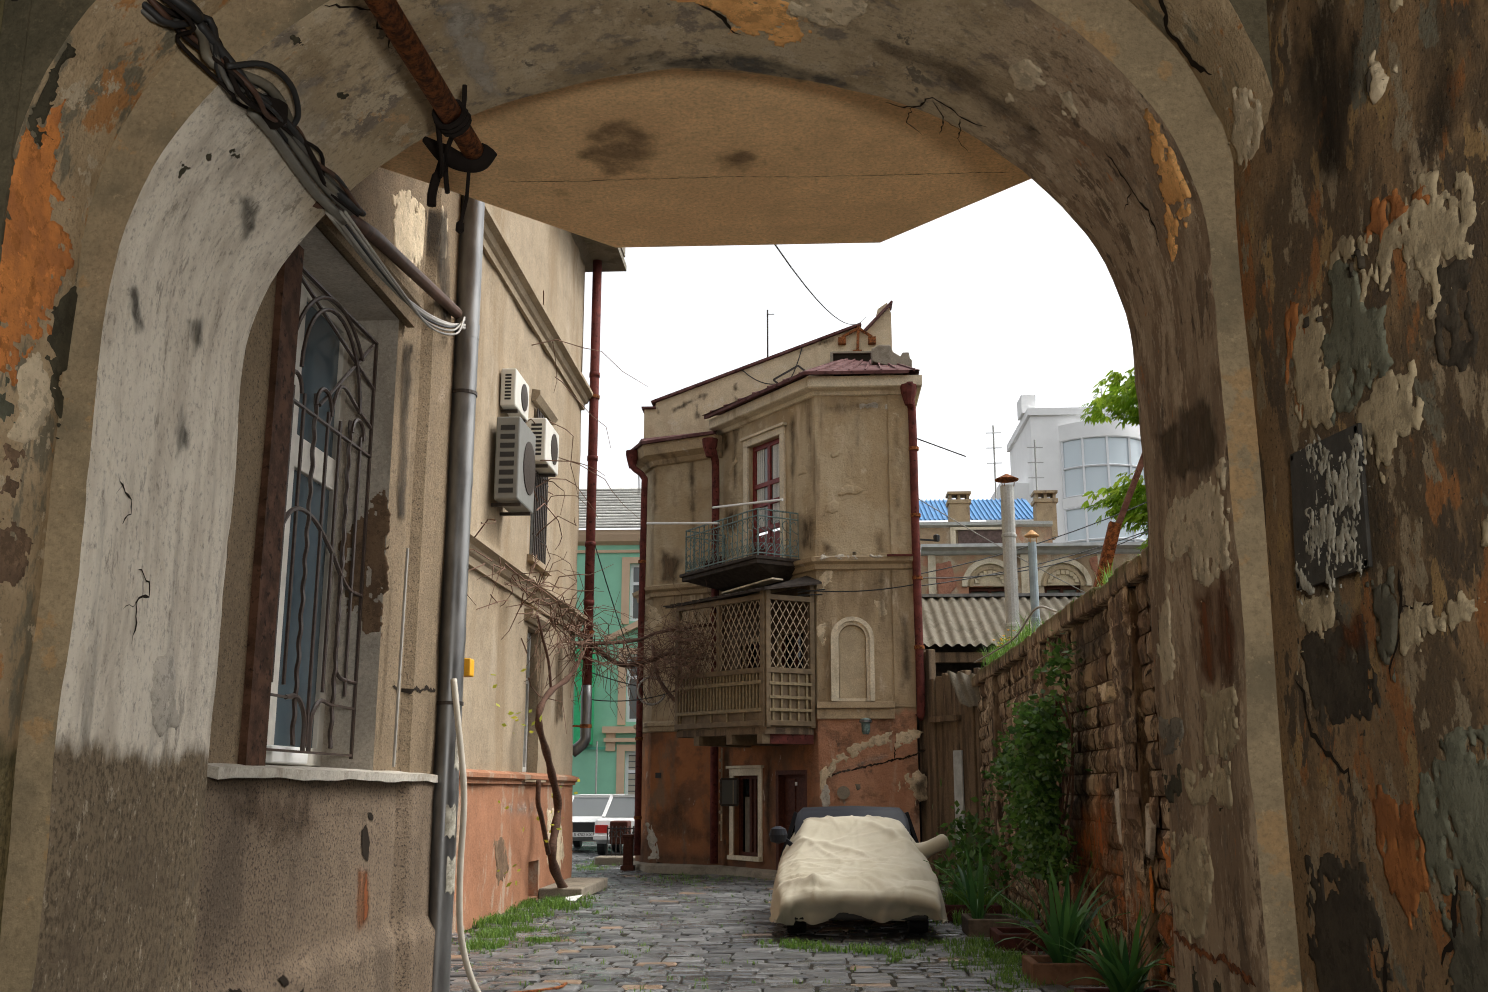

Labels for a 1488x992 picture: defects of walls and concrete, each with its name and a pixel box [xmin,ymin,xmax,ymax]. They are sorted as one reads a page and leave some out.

peeling [671,0,868,48]
crack [1158,0,1212,75]
peeling [1389,0,1403,13]
crack [864,97,1005,176]
peeling [1143,108,1191,262]
peeling [0,43,78,498]
peeling [1284,170,1488,484]
peeling [0,518,33,587]
peeling [1475,514,1488,548]
peeling [1295,566,1486,736]
crack [828,741,925,777]